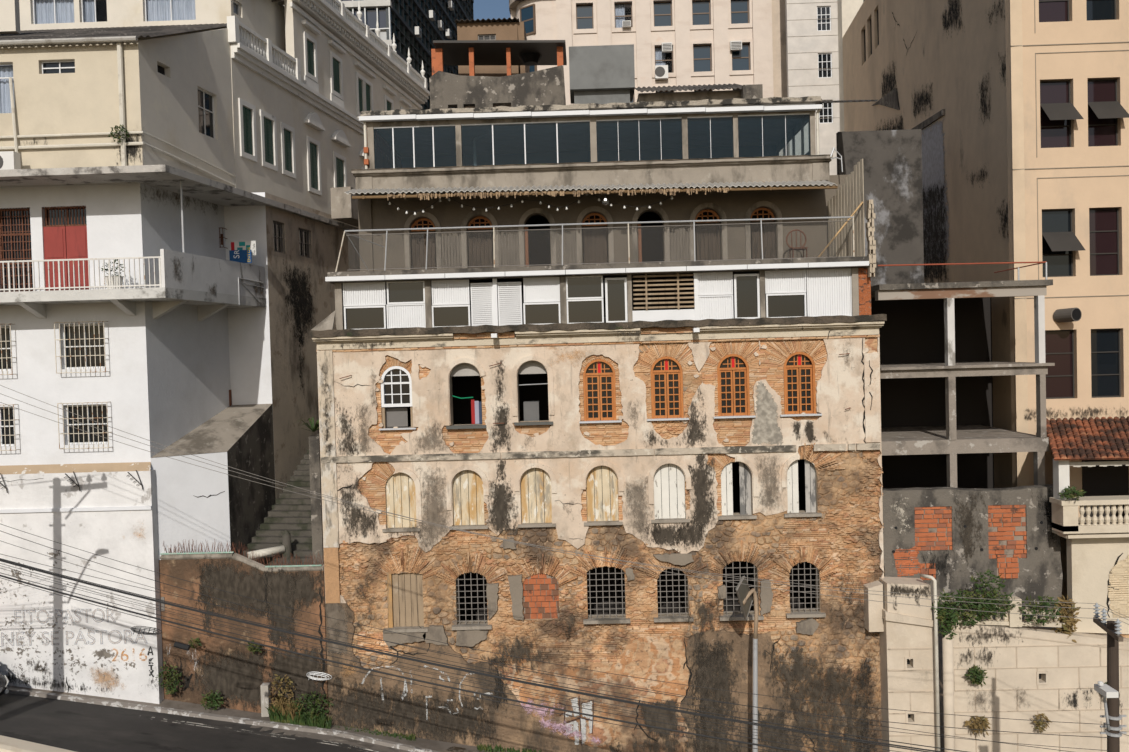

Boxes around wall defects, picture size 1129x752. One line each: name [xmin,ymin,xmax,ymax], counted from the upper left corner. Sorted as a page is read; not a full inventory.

mould [942,0,963,33]
mould [881,63,897,98]
mould [912,83,933,118]
leakage [488,361,518,534]
leakage [627,392,716,549]
leakage [341,479,398,543]
leakage [412,475,448,546]
flaking render [338,337,922,752]
flaking render [1108,556,1129,618]
peeling [0,562,137,686]